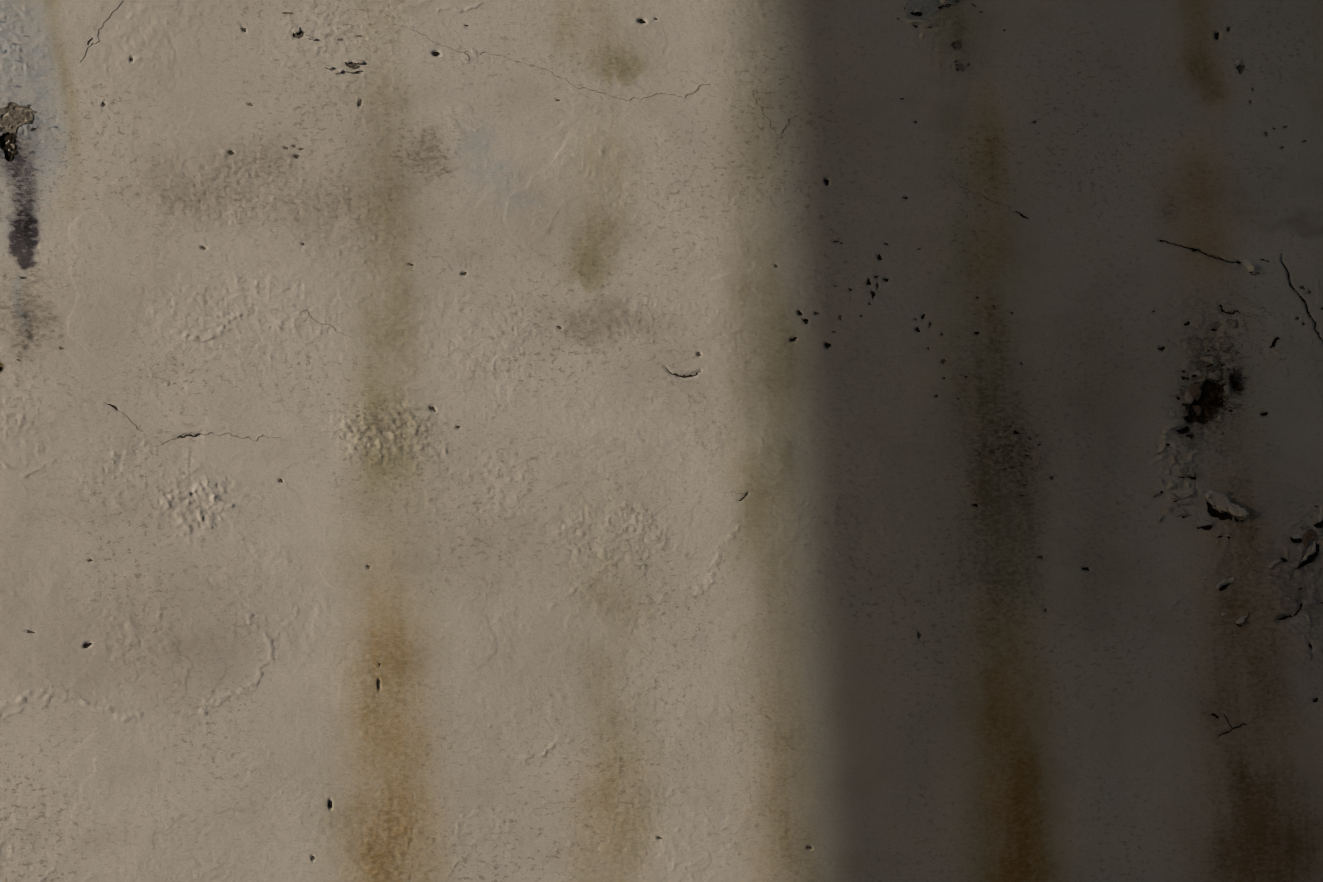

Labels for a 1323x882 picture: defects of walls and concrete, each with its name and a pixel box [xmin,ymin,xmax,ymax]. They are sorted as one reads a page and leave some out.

crack [394,24,709,101]
flaking render [0,85,37,162]
water stain [3,140,38,269]
crack [1159,240,1323,341]
flaking render [1146,319,1250,539]
peeling [1264,505,1323,581]